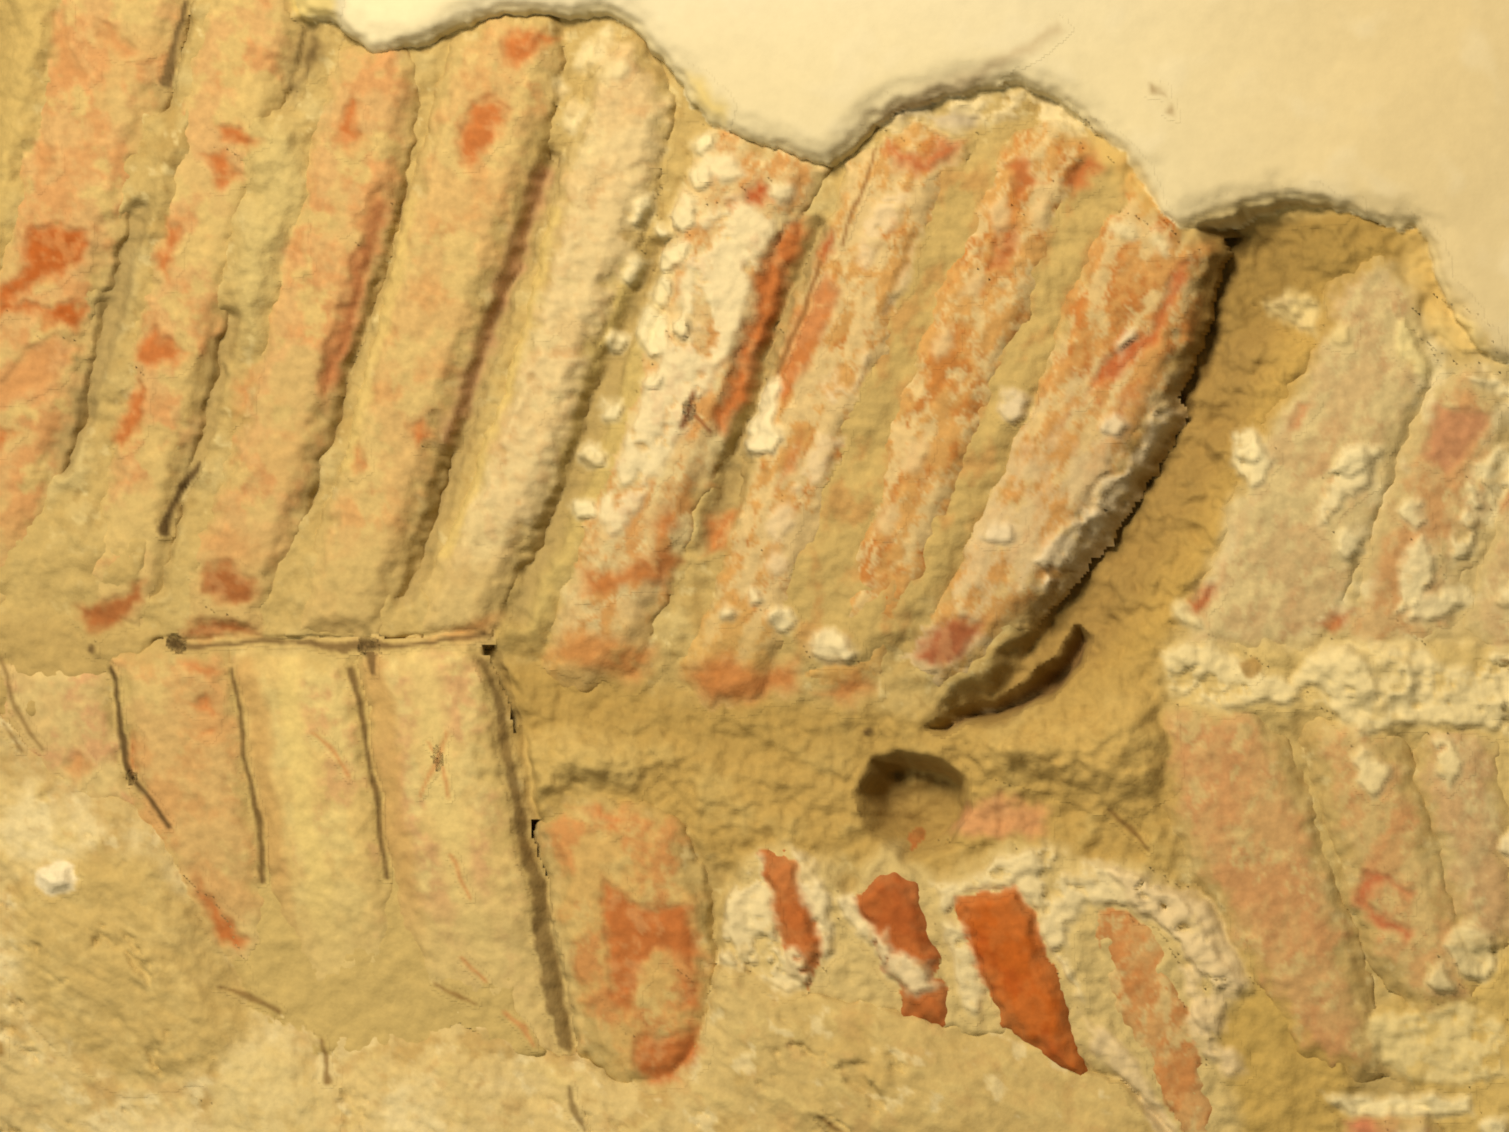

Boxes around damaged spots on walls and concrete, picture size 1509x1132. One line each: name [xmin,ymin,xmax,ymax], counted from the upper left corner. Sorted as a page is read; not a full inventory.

crack [103,661,176,833]
spalling [169,651,227,744]
flaking render [0,0,481,677]
flaking render [182,867,547,1057]
crack [162,626,590,1132]
flaking render [366,16,1509,1132]